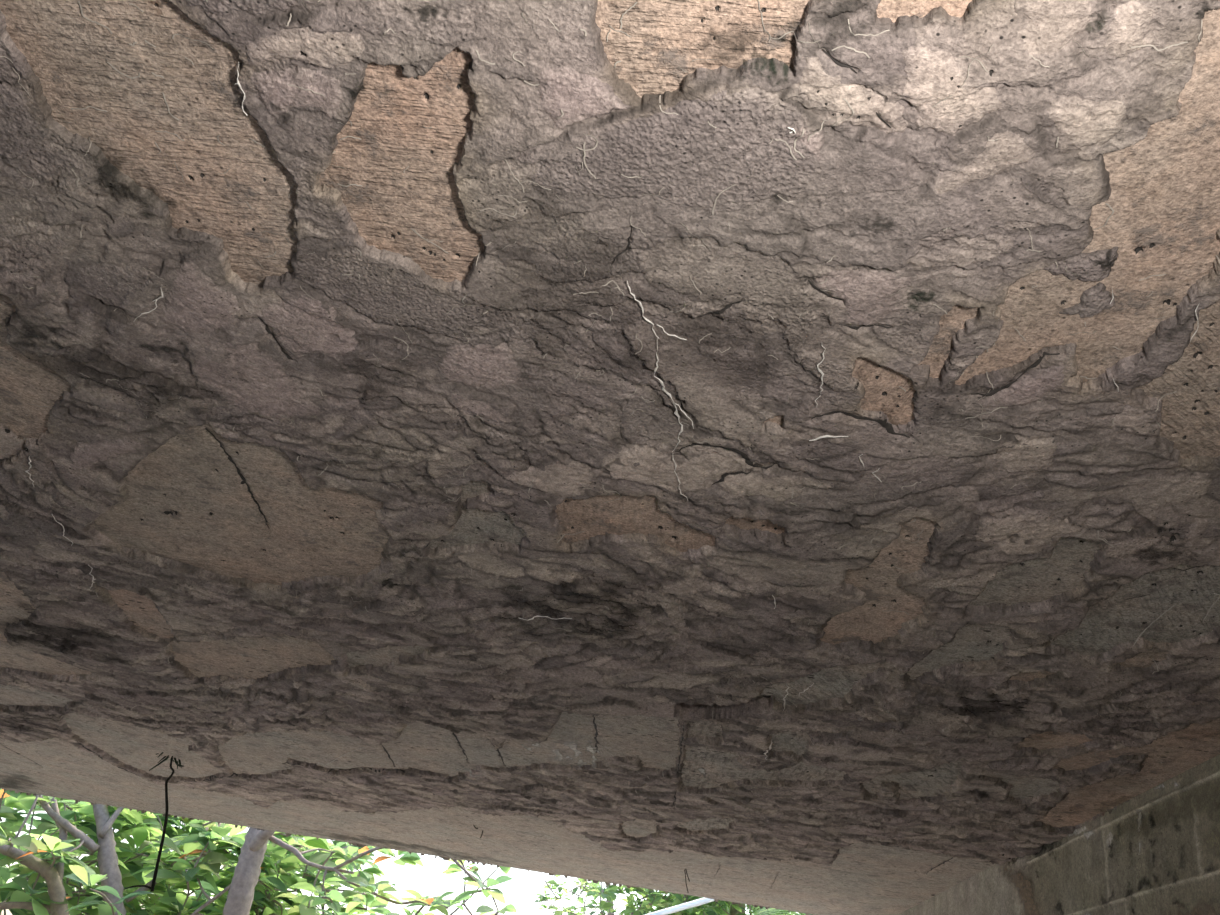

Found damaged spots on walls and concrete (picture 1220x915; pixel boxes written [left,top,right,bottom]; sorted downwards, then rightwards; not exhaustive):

peeling [595,0,810,98]
peeling [0,0,298,284]
peeling [319,47,484,282]
peeling [955,8,1220,385]
peeling [1132,300,1220,459]
crack [205,428,269,527]
peeling [90,424,391,585]
peeling [108,589,429,680]
crack [452,733,505,766]
peeling [0,685,1011,915]
crack [592,715,600,753]
crack [673,721,685,808]